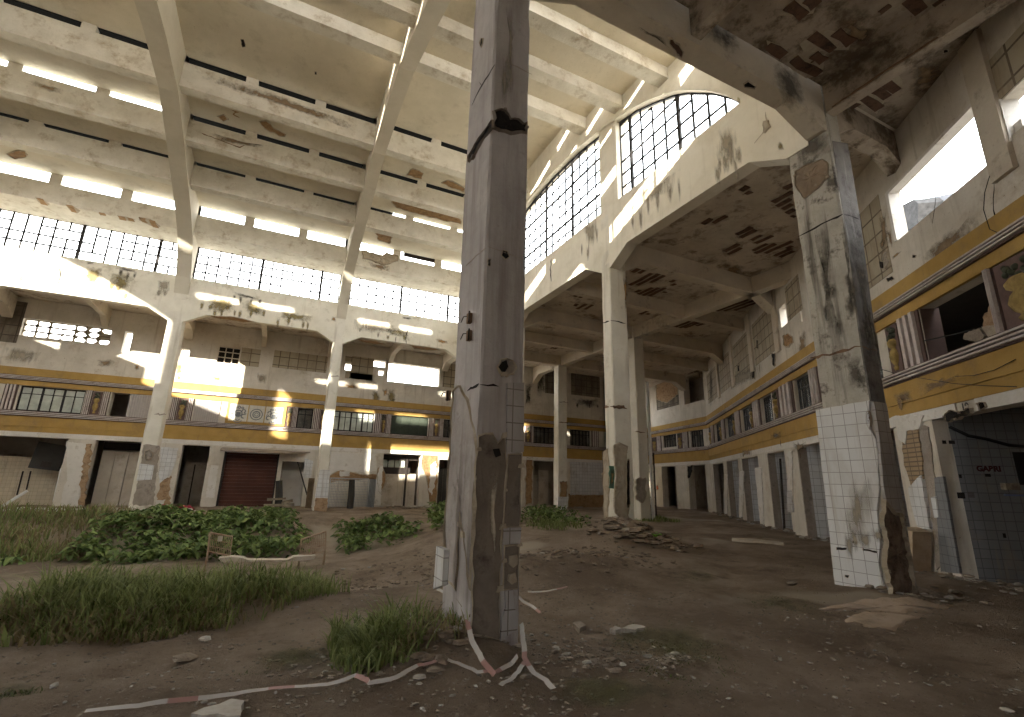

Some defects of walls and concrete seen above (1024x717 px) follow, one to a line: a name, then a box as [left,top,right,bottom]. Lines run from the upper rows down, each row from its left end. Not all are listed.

spalling [778,0,822,21]
spalling [878,0,945,16]
spalling [764,28,857,79]
spalling [832,37,938,114]
spalling [259,120,286,137]
spalling [467,107,529,163]
spalling [771,159,829,220]
leakage [821,252,841,331]
leakage [845,249,878,350]
spalling [421,385,525,641]
spalling [602,442,634,518]
spalling [818,498,953,631]